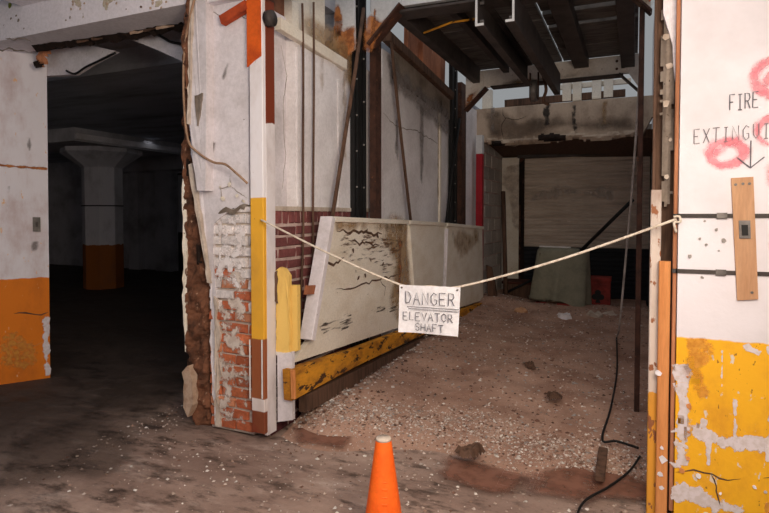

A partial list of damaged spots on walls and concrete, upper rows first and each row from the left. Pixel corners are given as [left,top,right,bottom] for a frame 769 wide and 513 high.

spalling [485,130,638,146]
spalling [660,10,675,207]
flaking render [32,0,257,435]
crack [339,275,396,295]
leakage [337,216,409,318]
peeling [657,339,769,513]
crack [685,469,737,504]